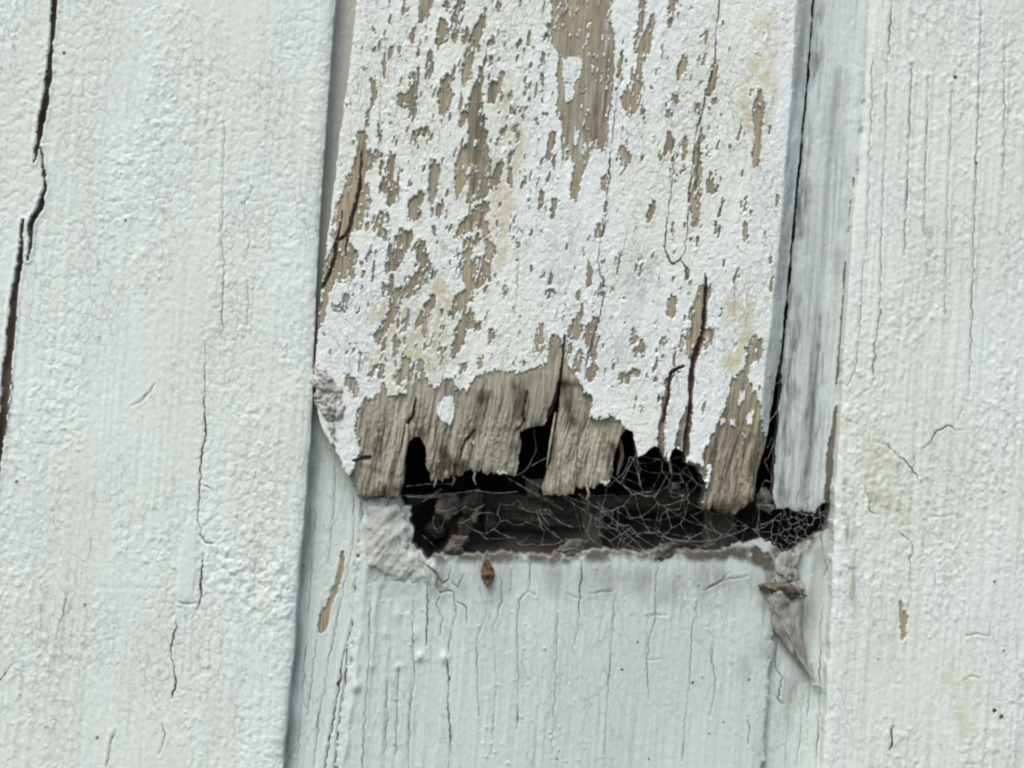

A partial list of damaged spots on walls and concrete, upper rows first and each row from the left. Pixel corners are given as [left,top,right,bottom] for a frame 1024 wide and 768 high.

peeling [311,0,771,514]
crack [845,0,1006,480]
peeling [317,551,345,634]
crack [298,471,538,768]
crack [551,565,615,754]
crack [646,568,663,700]
peeling [899,600,908,641]